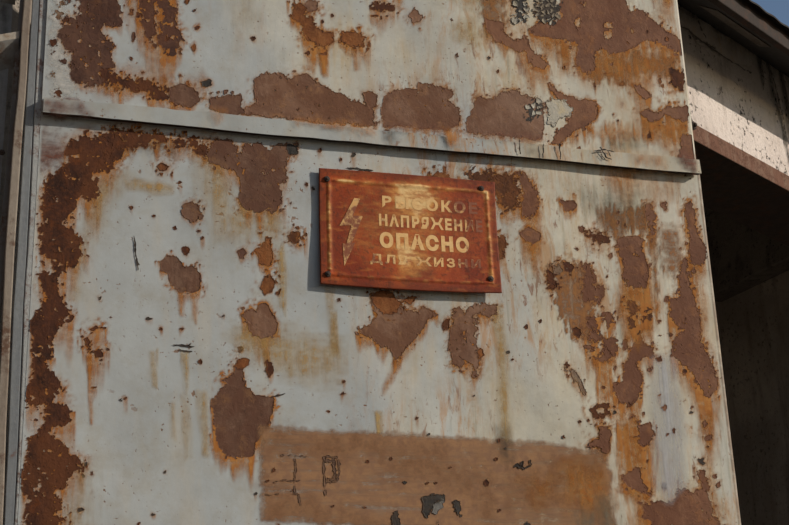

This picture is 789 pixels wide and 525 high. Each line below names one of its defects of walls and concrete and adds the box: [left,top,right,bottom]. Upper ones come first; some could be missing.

peeling [47,0,125,97]
peeling [136,0,756,147]
peeling [203,137,299,219]
rust [422,164,527,219]
peeling [155,250,205,299]
rust [497,229,509,262]
rust [679,198,708,285]
rust [20,124,210,525]
peeling [355,292,438,364]
rust [519,173,673,525]
peeling [210,366,280,480]
rust [694,419,721,504]